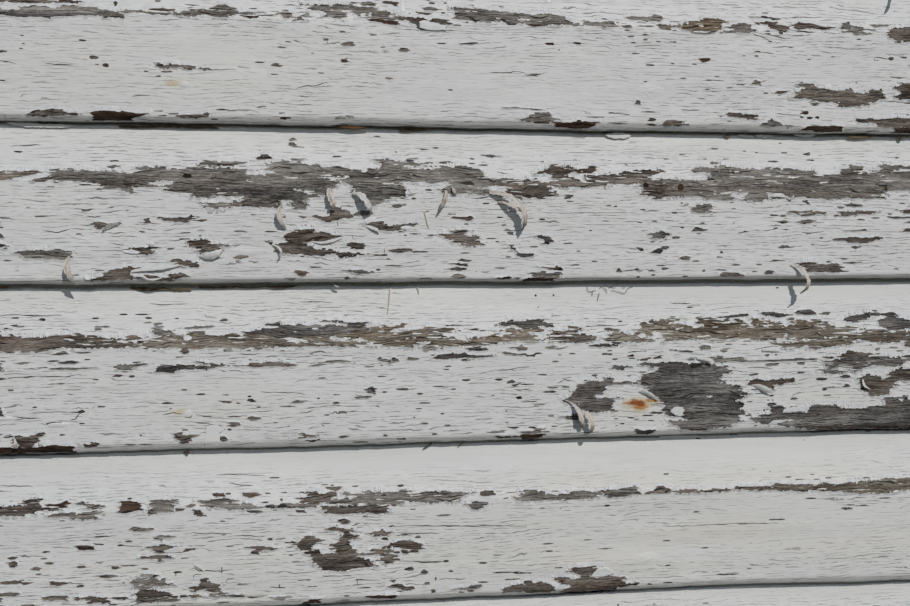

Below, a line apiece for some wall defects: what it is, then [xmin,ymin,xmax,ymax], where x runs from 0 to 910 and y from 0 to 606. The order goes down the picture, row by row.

peeling [278,0,910,45]
peeling [770,77,910,133]
peeling [0,138,910,284]
peeling [0,306,910,436]
rust [624,399,659,409]
peeling [0,411,102,456]
peeling [170,428,201,445]
peeling [220,414,262,443]
peeling [487,425,551,442]
peeling [511,473,910,504]
peeling [0,484,497,606]
peeling [494,562,638,595]